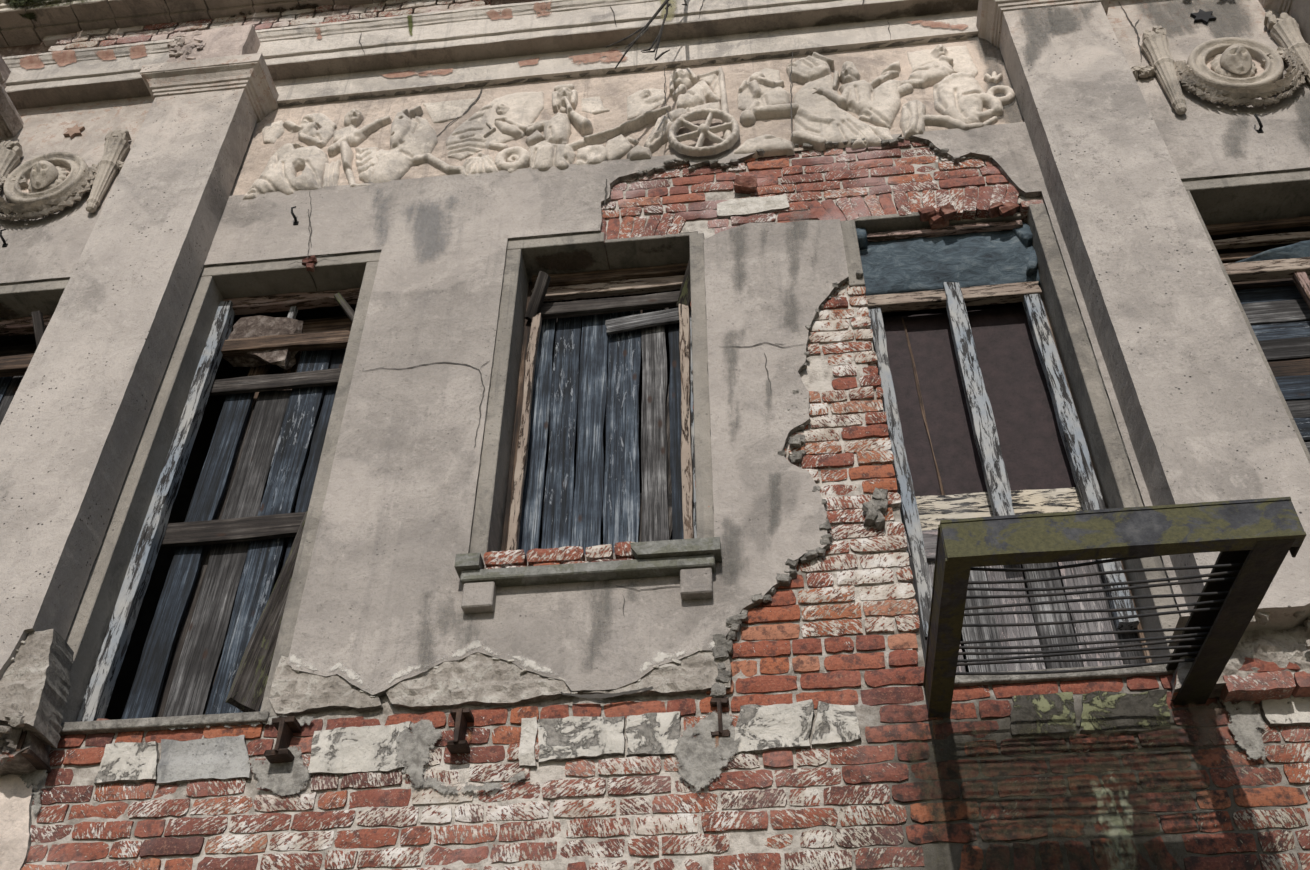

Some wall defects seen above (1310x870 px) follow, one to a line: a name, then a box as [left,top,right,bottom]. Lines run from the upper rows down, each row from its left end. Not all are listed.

damp [230,4,318,18]
spalling [289,209,337,272]
flaking render [601,136,1043,270]
crack [366,361,488,447]
flaking render [269,270,925,717]
spalling [0,629,74,777]
spalling [1170,656,1196,701]
spalling [1209,611,1310,706]